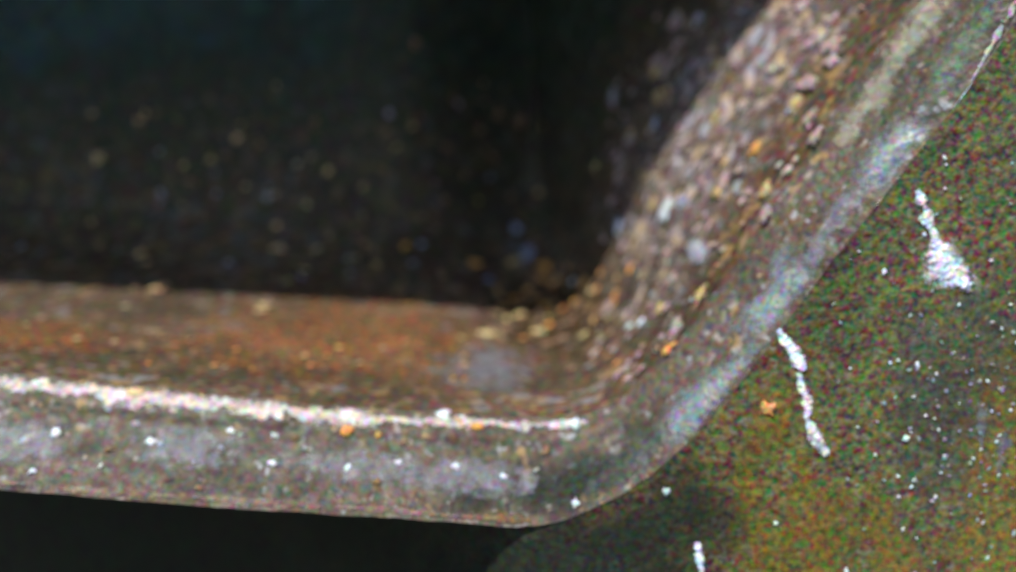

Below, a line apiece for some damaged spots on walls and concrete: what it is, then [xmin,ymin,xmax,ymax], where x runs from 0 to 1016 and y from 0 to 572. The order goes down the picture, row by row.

corrosion [436,0,846,383]
efflorescence [915,189,973,292]
corrosion [760,400,777,417]
efflorescence [777,329,829,456]
corrosion [60,486,174,499]
corrosion [193,484,321,509]
corrosion [335,505,531,524]
water stain [535,488,726,572]